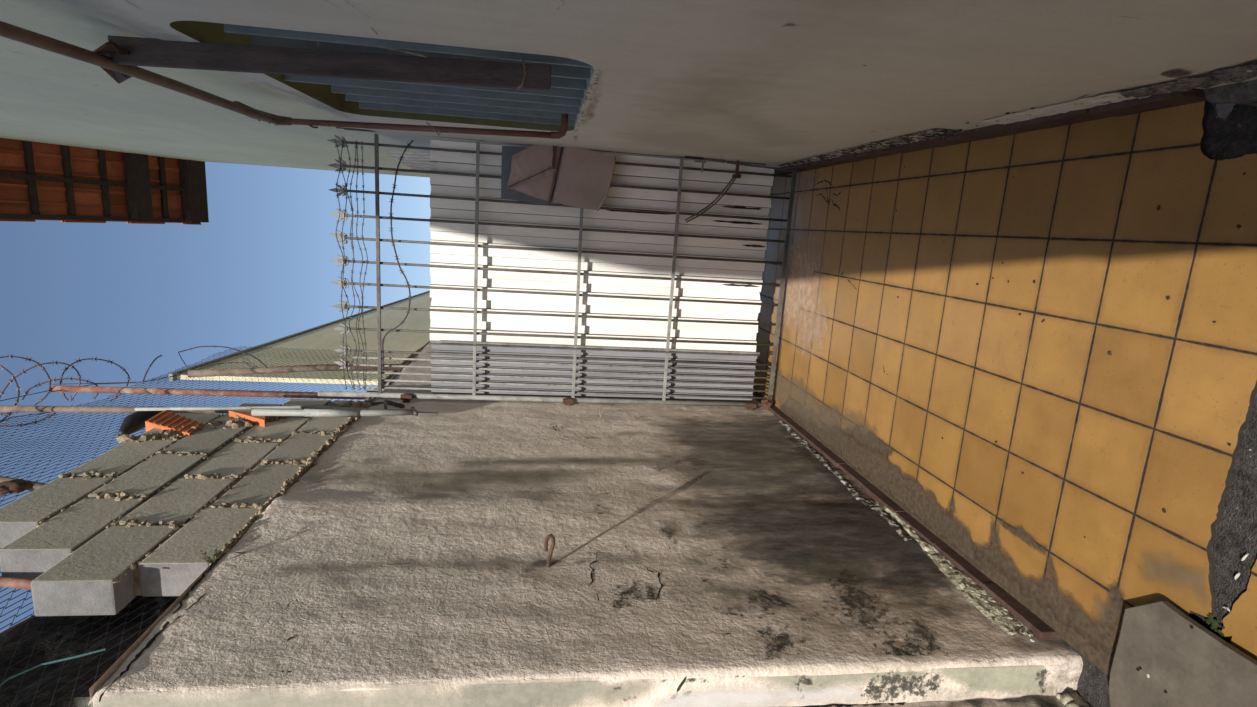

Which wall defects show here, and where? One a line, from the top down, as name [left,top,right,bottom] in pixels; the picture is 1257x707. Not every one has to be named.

flaking render [779,61,1257,166]
water stain [690,421,941,596]